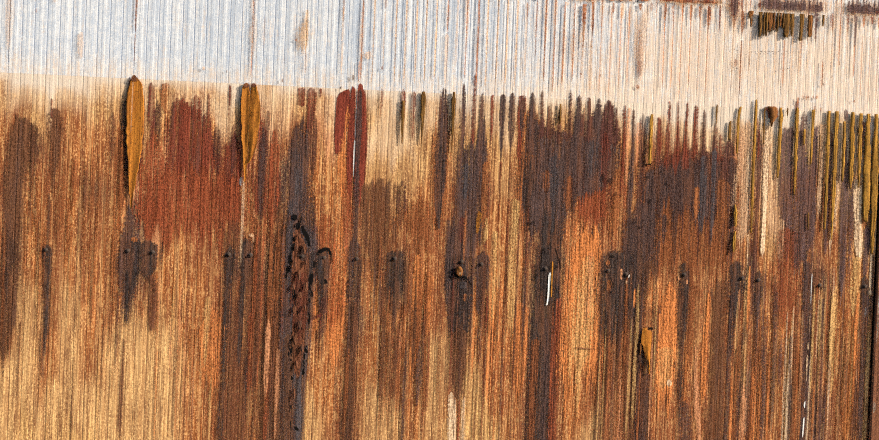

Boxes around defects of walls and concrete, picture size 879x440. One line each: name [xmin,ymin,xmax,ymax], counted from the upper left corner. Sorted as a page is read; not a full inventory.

corrosion [0,99,95,400]
corrosion [109,75,322,440]
corrosion [311,0,879,440]